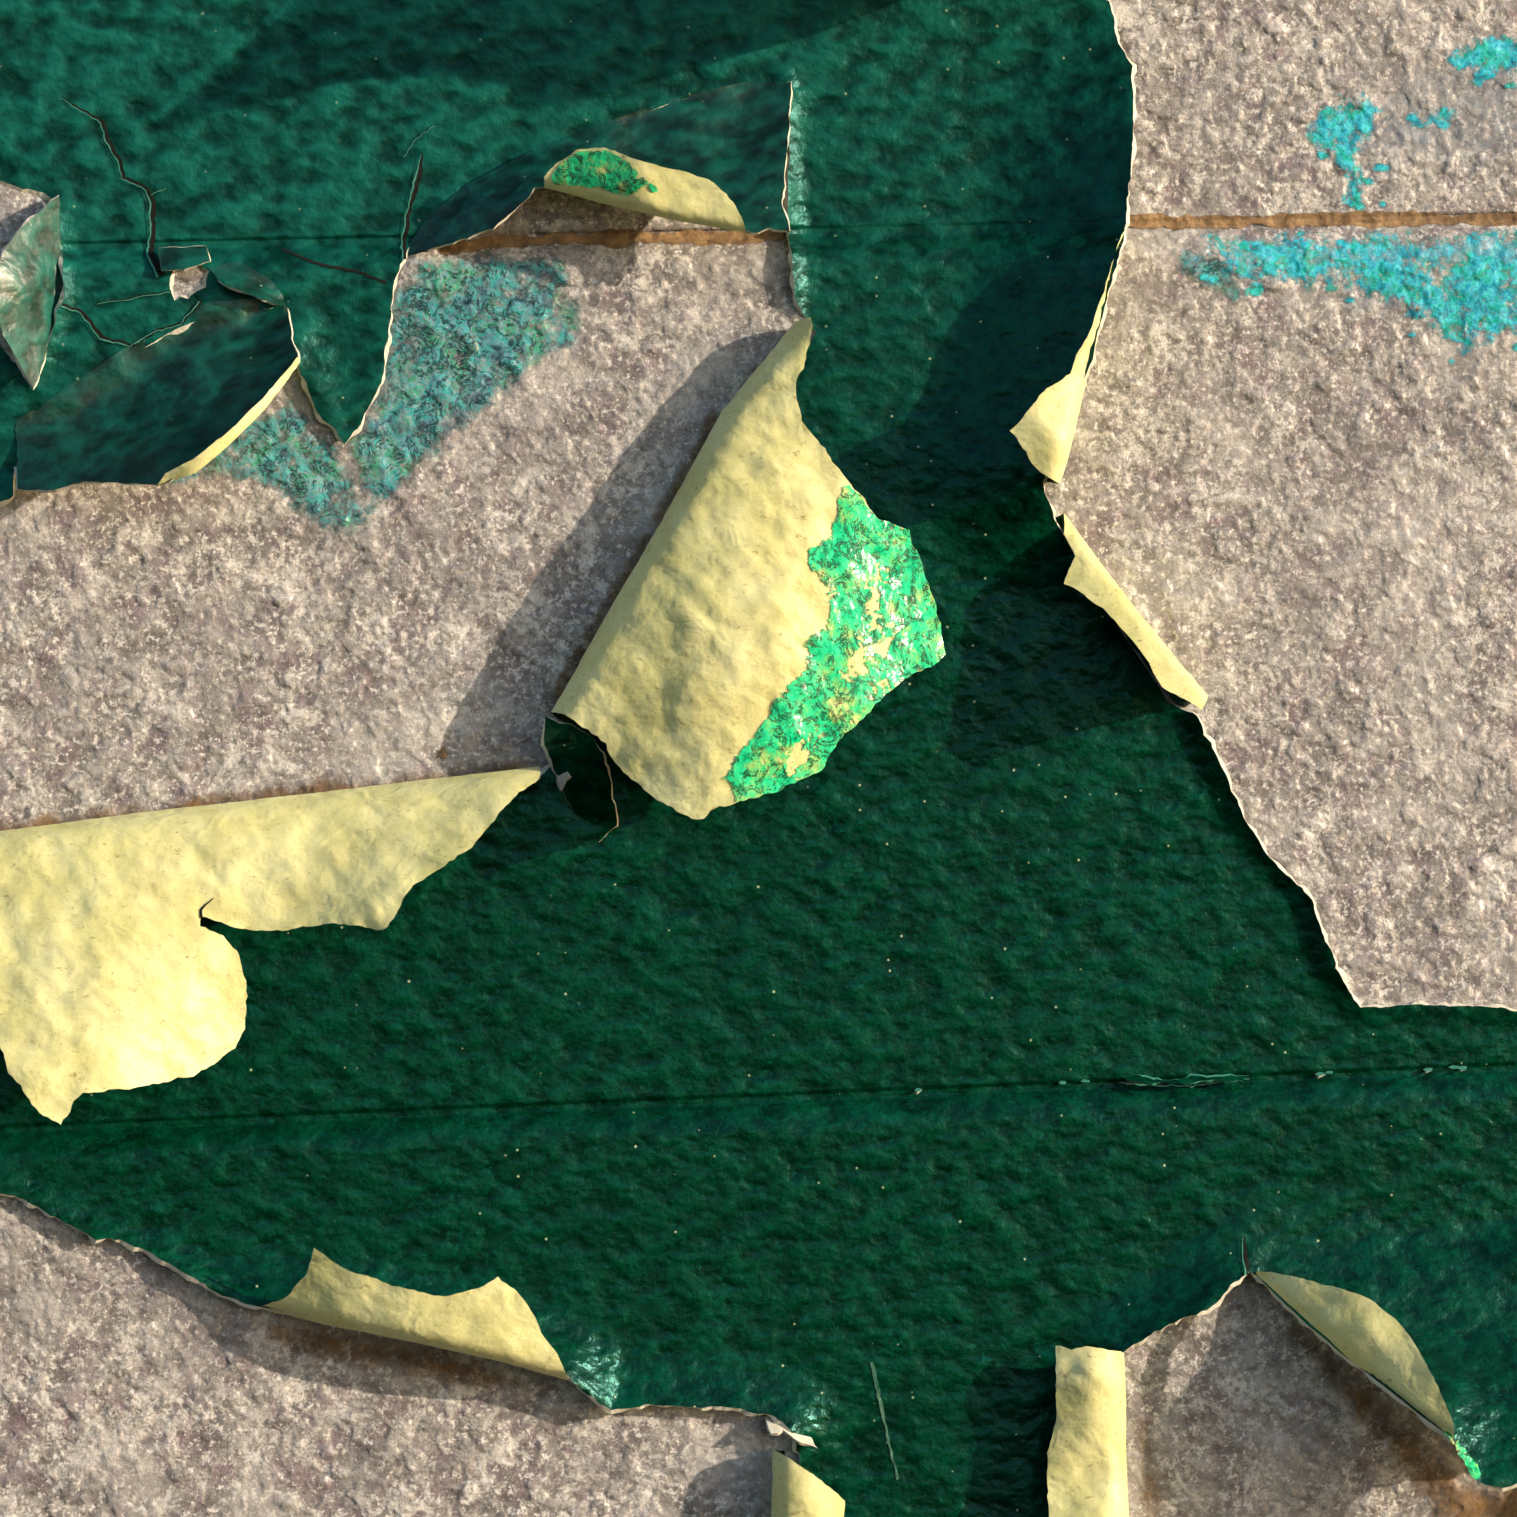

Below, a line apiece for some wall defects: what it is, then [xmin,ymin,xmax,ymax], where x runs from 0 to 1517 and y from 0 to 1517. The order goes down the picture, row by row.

crack [60,97,202,347]
crack [281,124,435,284]
peeling [0,81,946,1125]
peeling [1010,0,1517,1009]
peeling [1122,1074,1249,1086]
peeling [1423,1065,1467,1073]
peeling [0,1195,845,1517]
peeling [1047,1271,1517,1517]